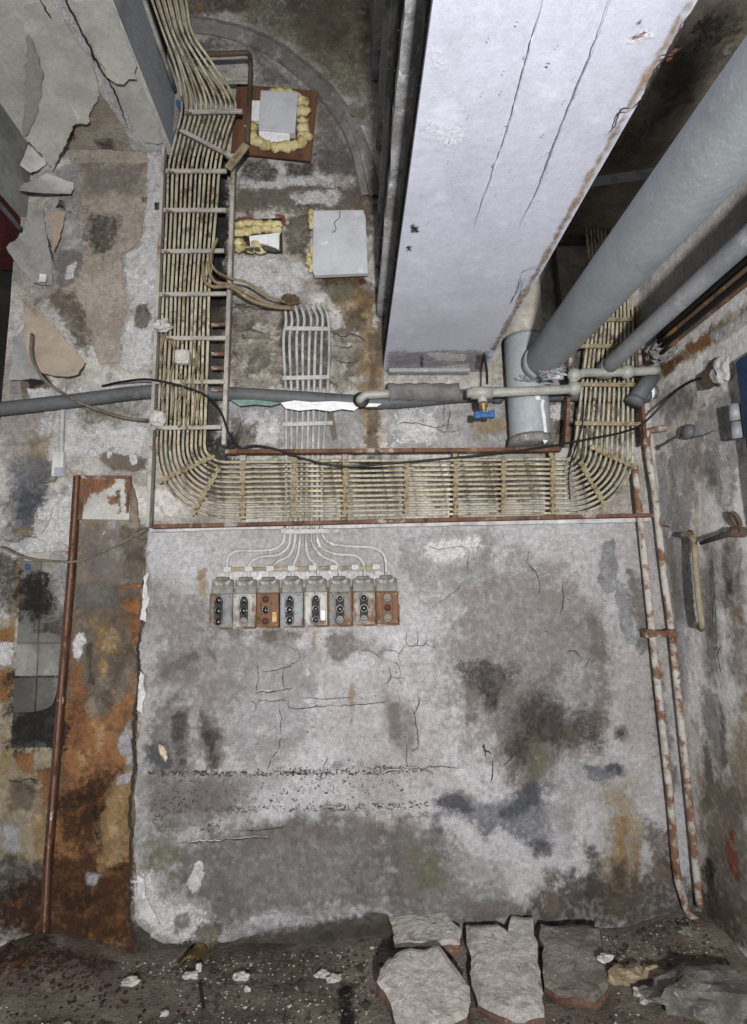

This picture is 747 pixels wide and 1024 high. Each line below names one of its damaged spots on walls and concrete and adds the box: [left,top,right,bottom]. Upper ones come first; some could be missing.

flaking render [6,0,163,373]
water stain [68,149,147,164]
crack [475,0,545,225]
corrosion [491,118,623,350]
crack [521,1,610,224]
corrosion [629,15,682,107]
peeling [9,329,55,398]
corrosion [35,475,147,952]
crack [251,632,457,775]
water stain [123,566,747,951]